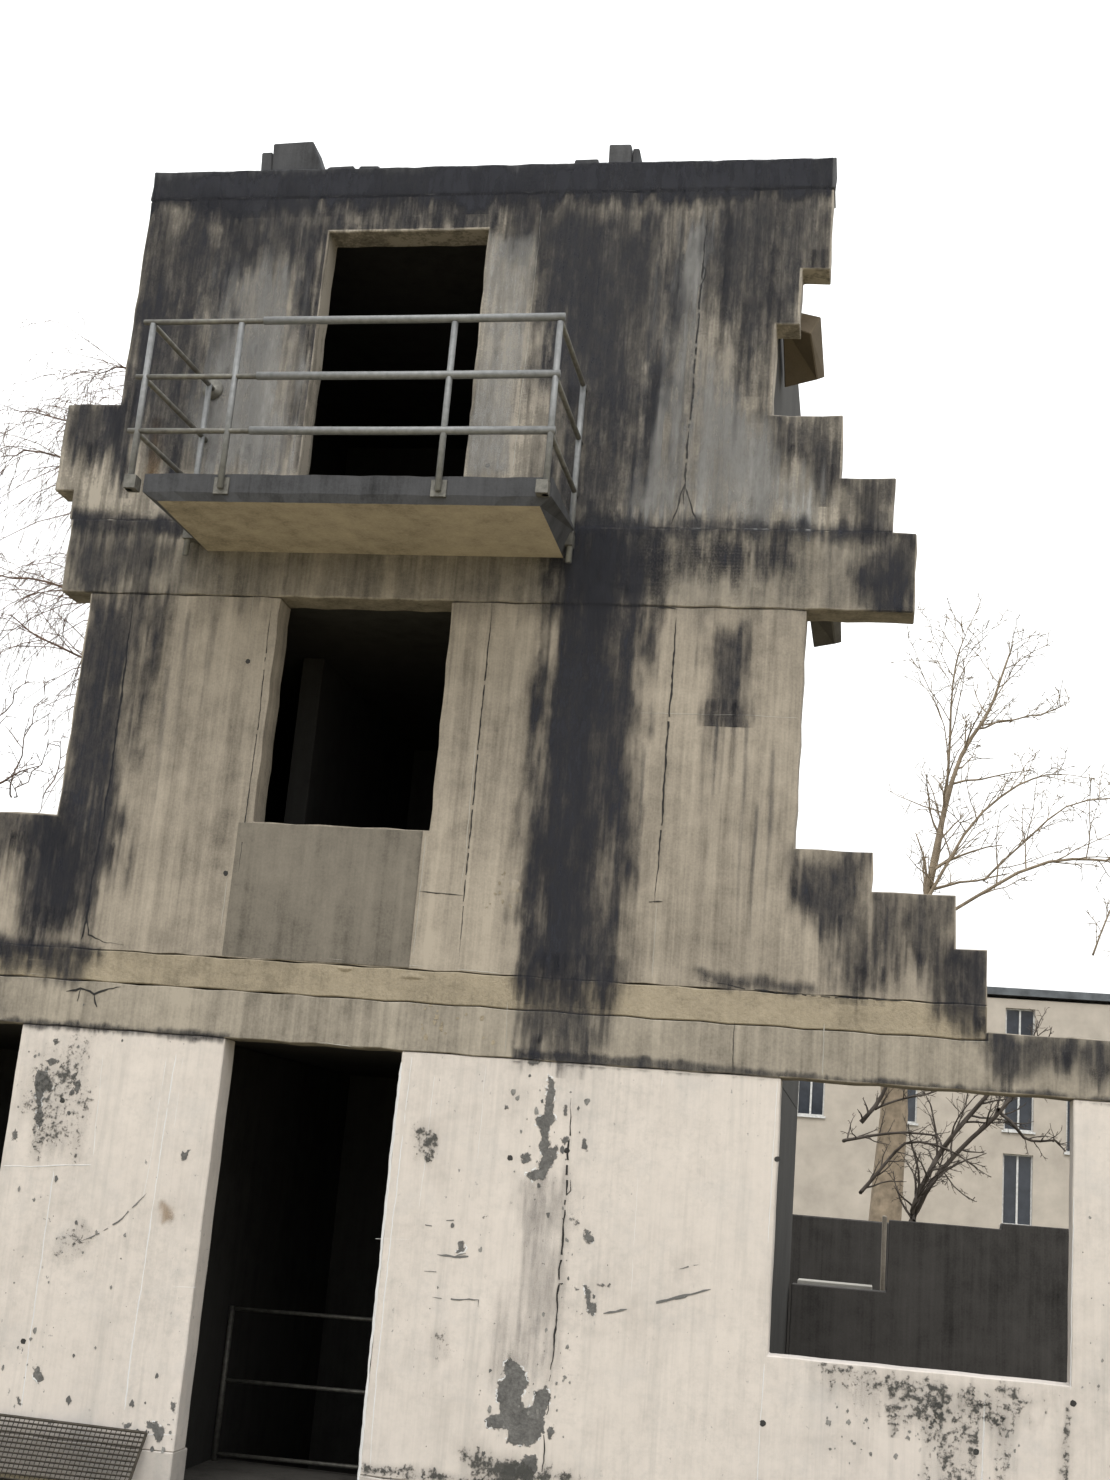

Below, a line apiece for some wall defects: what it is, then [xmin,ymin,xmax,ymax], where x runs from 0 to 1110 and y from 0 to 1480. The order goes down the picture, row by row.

damp [69,157,916,1076]
damp [0,510,183,982]
damp [790,851,1109,1101]
peeling [12,1039,81,1148]
damp [9,1019,224,1163]
peeling [451,1223,482,1254]
peeling [504,1060,611,1316]
peeling [477,1312,571,1480]
peeling [825,1406,872,1464]